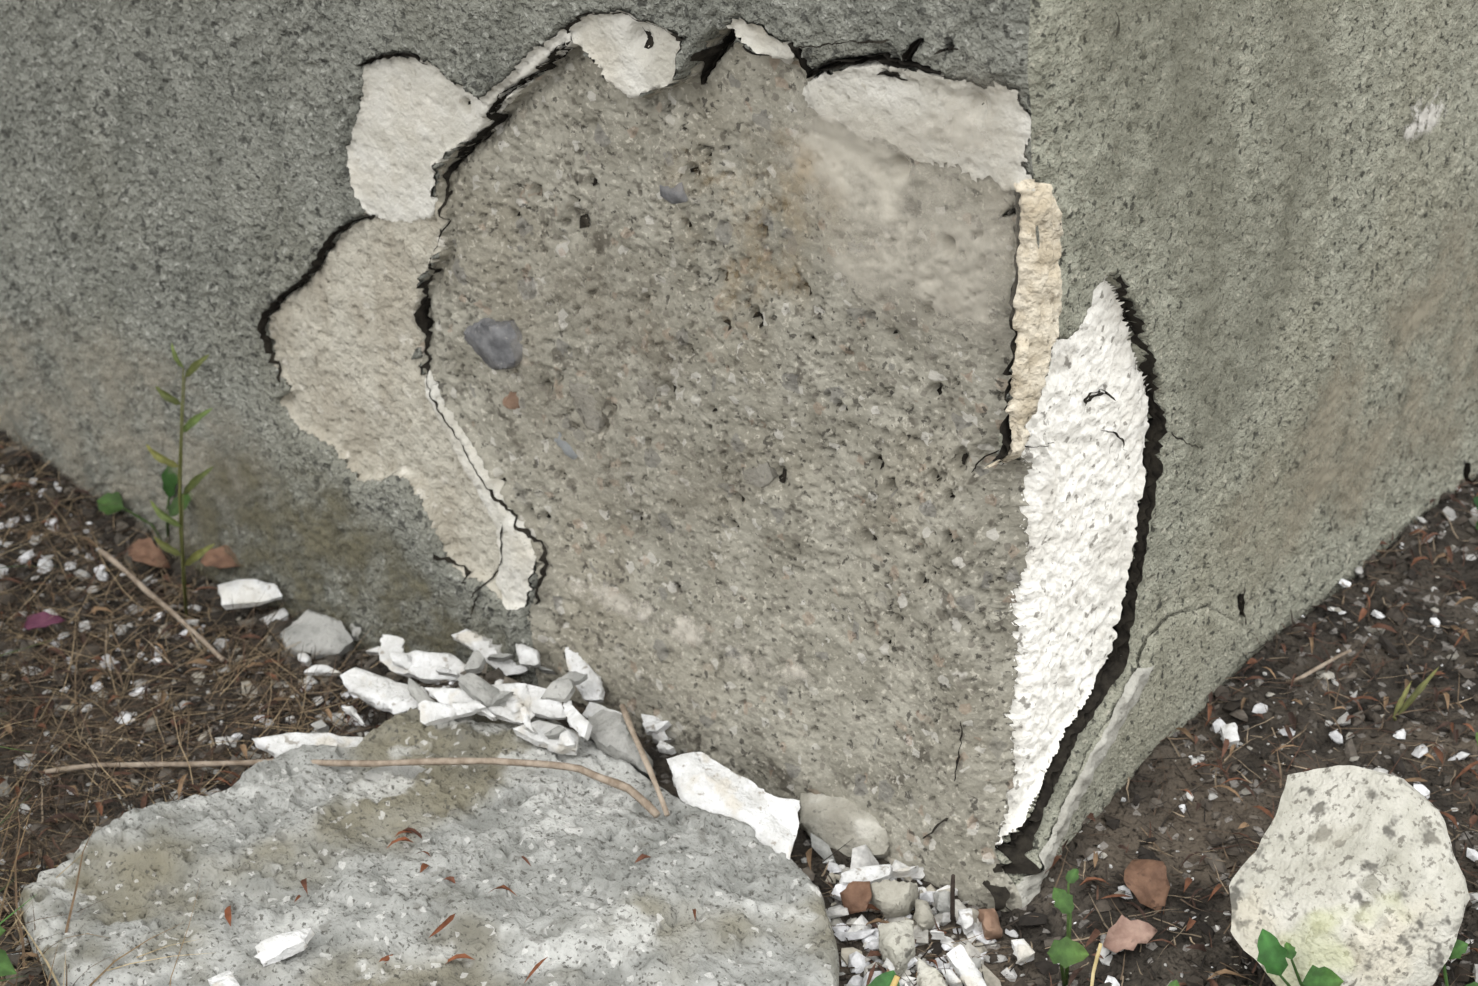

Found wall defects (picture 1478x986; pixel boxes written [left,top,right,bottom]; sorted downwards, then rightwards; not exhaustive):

crack [257,214,375,386]
crack [356,52,428,67]
crack [414,12,958,627]
flaking render [253,10,1152,986]
crack [971,191,1054,473]
crack [982,275,1205,911]